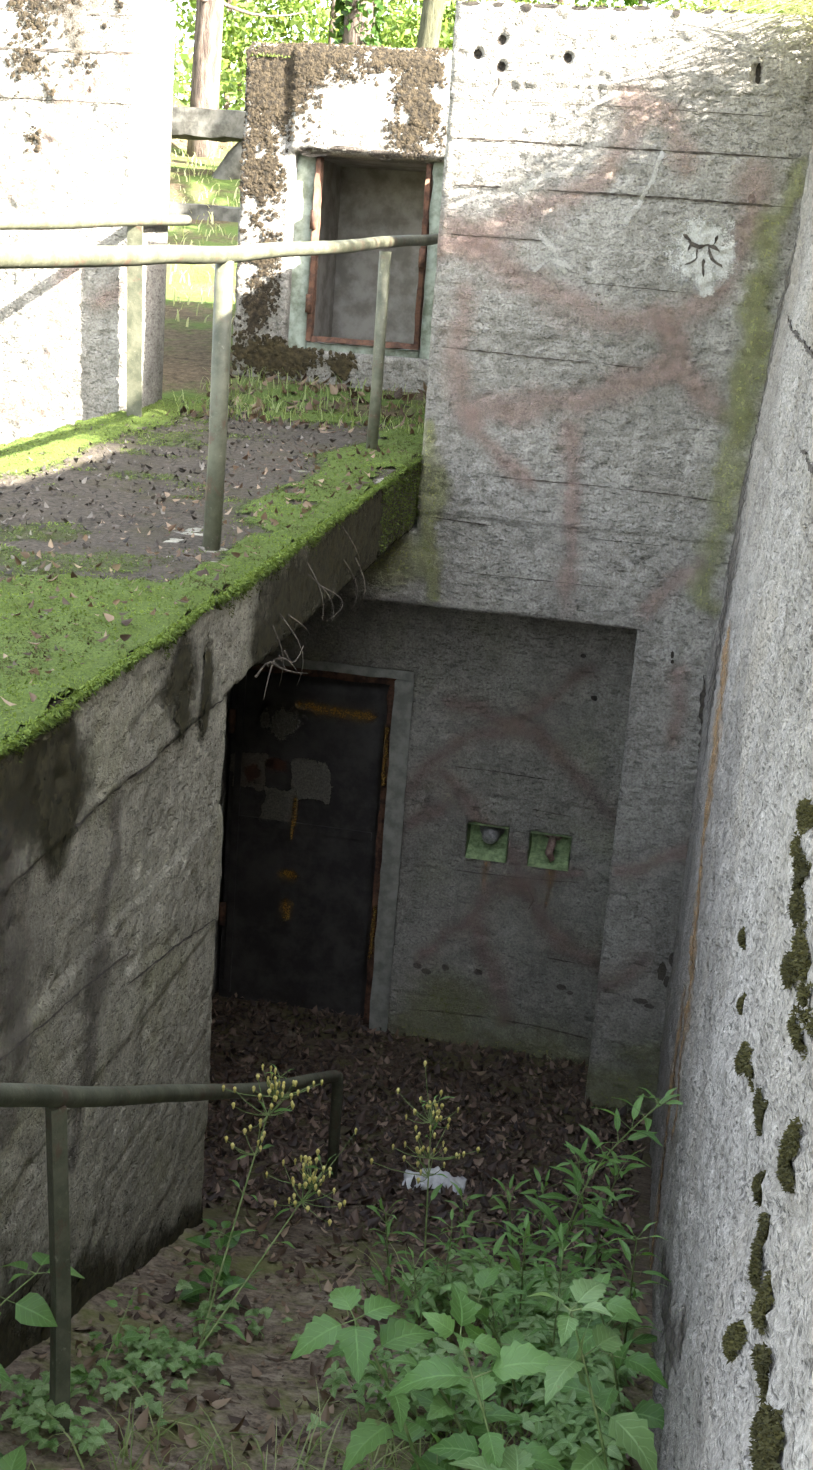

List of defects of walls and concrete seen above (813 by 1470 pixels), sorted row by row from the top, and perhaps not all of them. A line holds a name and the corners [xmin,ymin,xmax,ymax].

water stain [162,631,214,741]
corrosion [295,700,390,787]